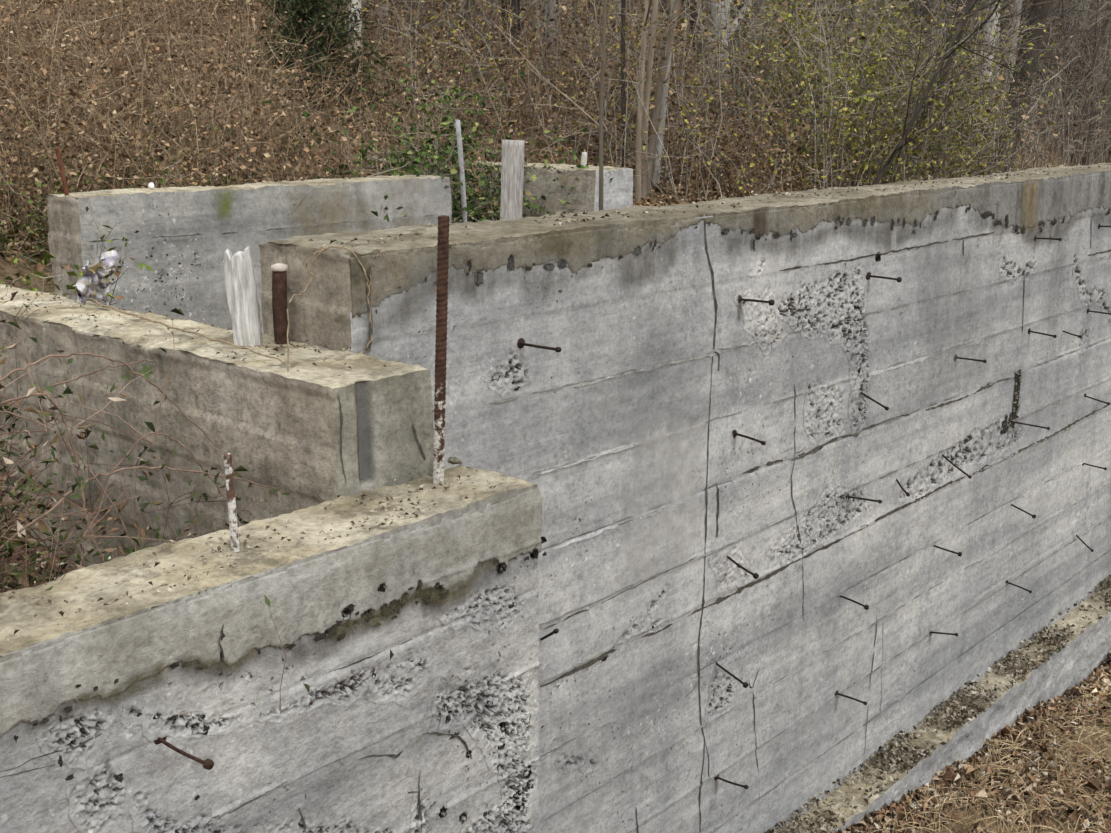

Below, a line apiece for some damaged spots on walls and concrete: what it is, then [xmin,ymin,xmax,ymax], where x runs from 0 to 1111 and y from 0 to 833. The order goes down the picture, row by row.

peeling [0,488,674,833]
crack [688,222,720,833]
peeling [349,173,1111,484]
spalling [895,369,1024,506]